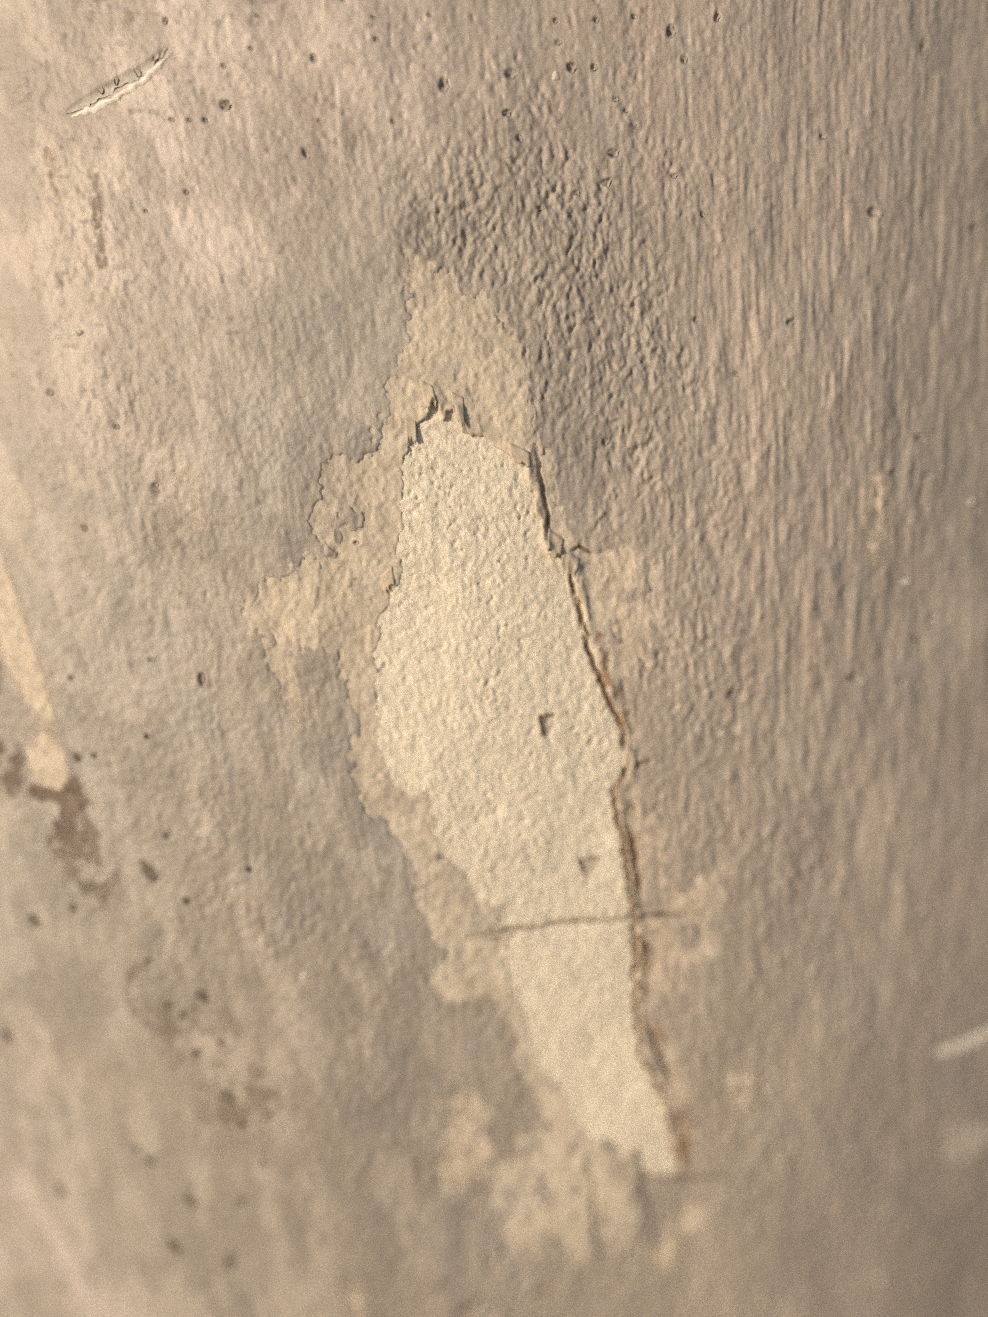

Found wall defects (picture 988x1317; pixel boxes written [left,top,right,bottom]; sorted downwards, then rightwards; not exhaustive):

corrosion [0,551,69,795]
peeling [235,249,736,1276]
crack [468,444,700,1165]